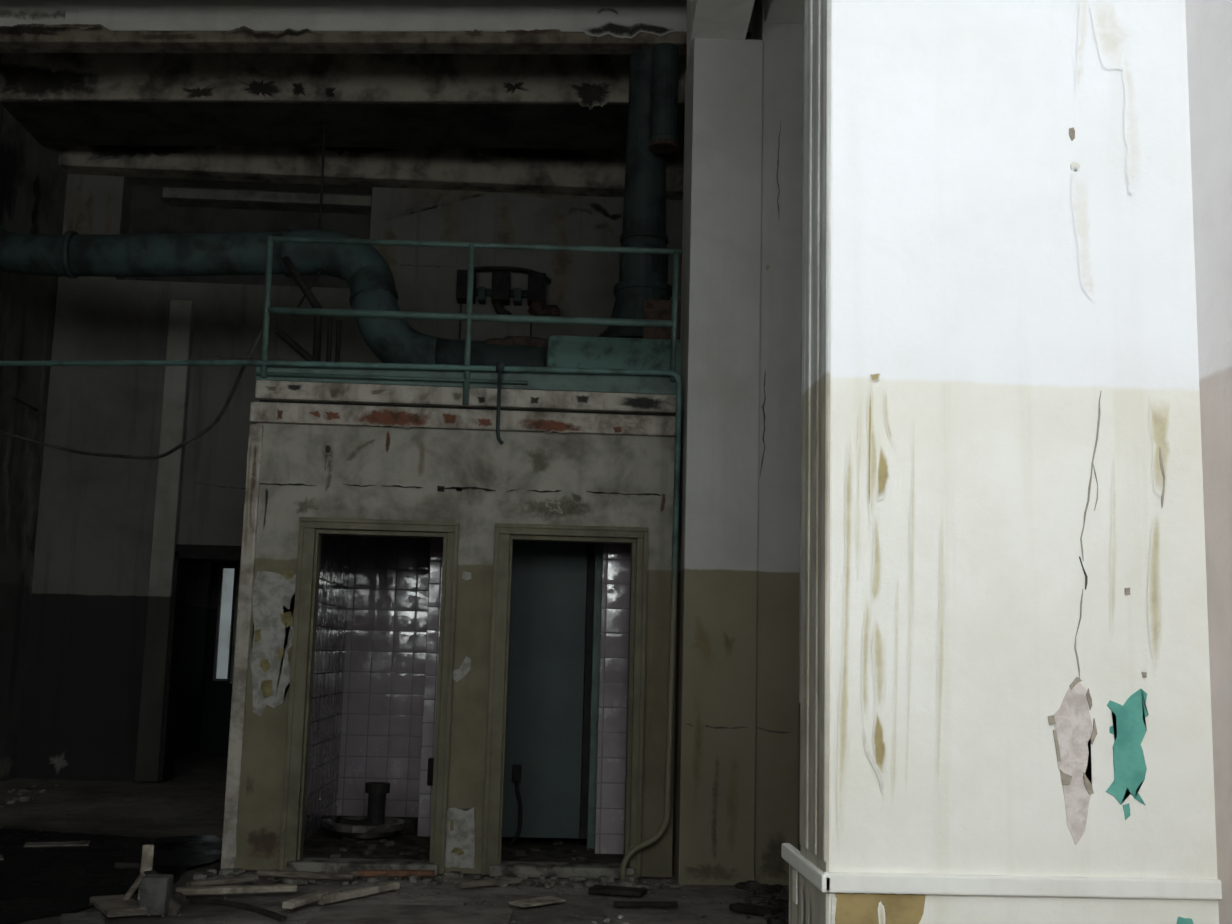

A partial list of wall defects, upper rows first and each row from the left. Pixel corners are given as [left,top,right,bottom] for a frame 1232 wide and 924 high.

water stain [0,7,93,38]
water stain [0,61,112,101]
water stain [88,146,216,161]
water stain [236,77,307,99]
rust [308,407,458,453]
peeling [249,571,296,716]
water stain [836,373,915,841]
water stain [936,508,945,794]
crack [1074,392,1101,678]
water stain [1147,396,1172,672]
peeling [1048,672,1149,845]
peeling [831,893,925,924]